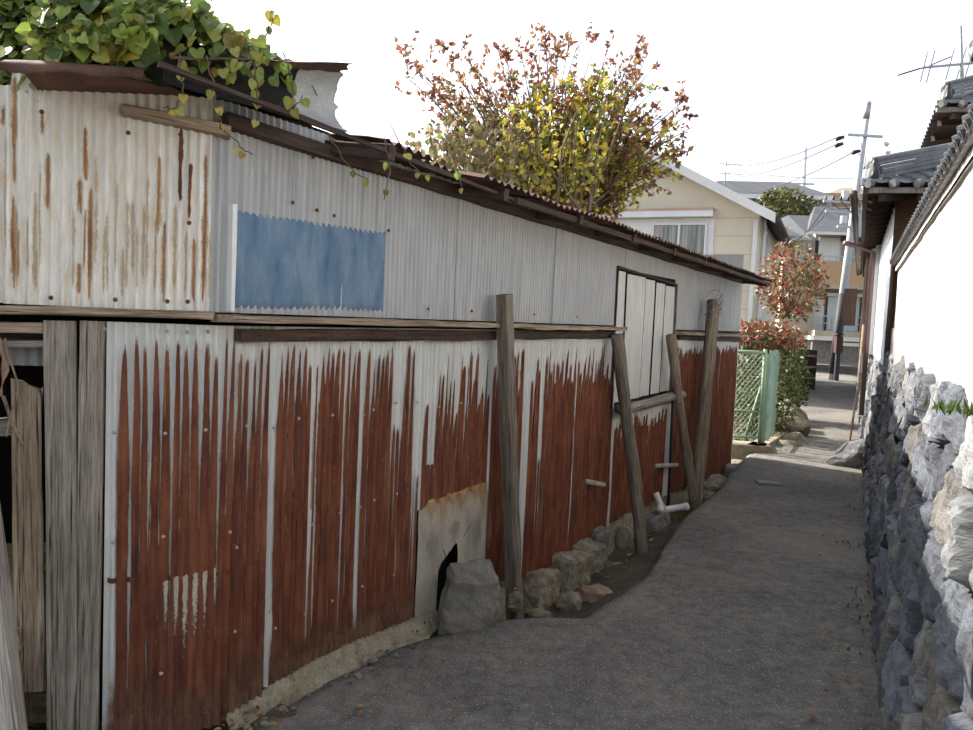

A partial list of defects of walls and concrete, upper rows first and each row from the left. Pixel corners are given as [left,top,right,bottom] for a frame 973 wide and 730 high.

corrosion [1,76,51,288]
corrosion [71,127,211,303]
corrosion [106,340,505,730]
corrosion [515,347,632,579]
corrosion [634,346,738,505]